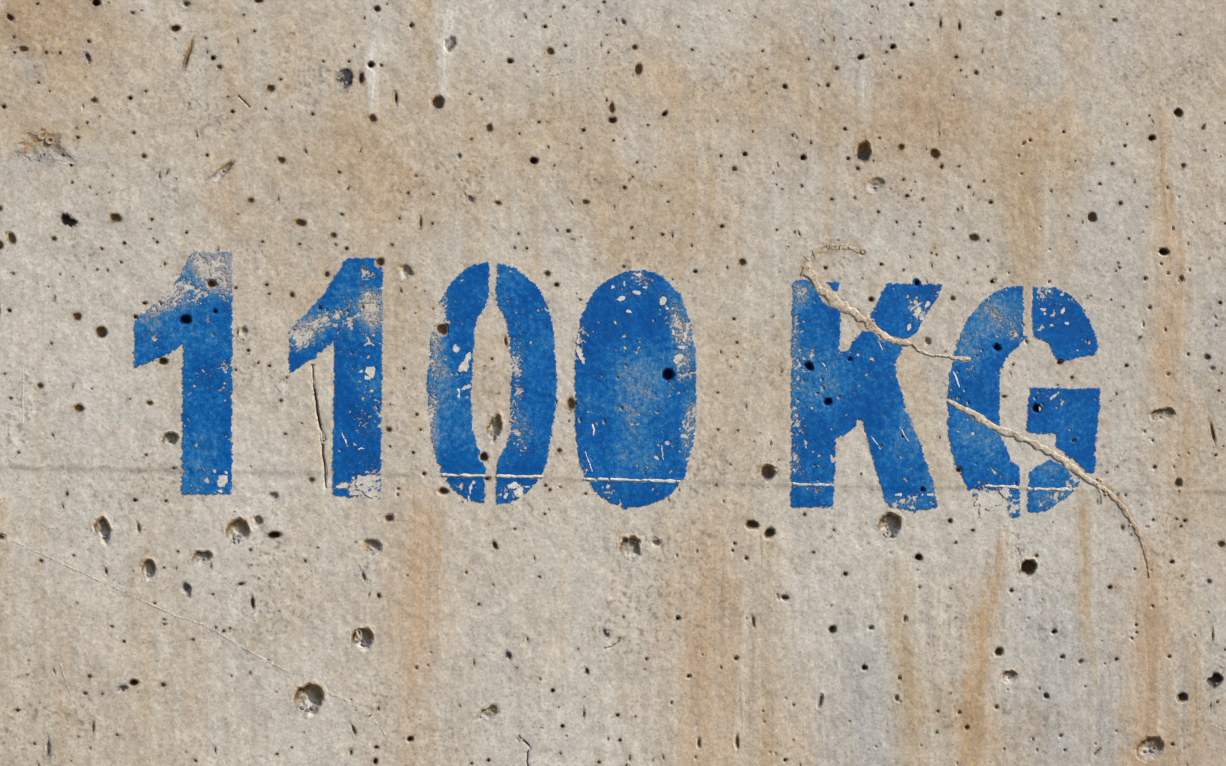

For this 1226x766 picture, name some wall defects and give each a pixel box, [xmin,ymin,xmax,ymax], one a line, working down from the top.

crack [790,234,971,361]
crack [308,366,329,488]
crack [947,399,1150,578]